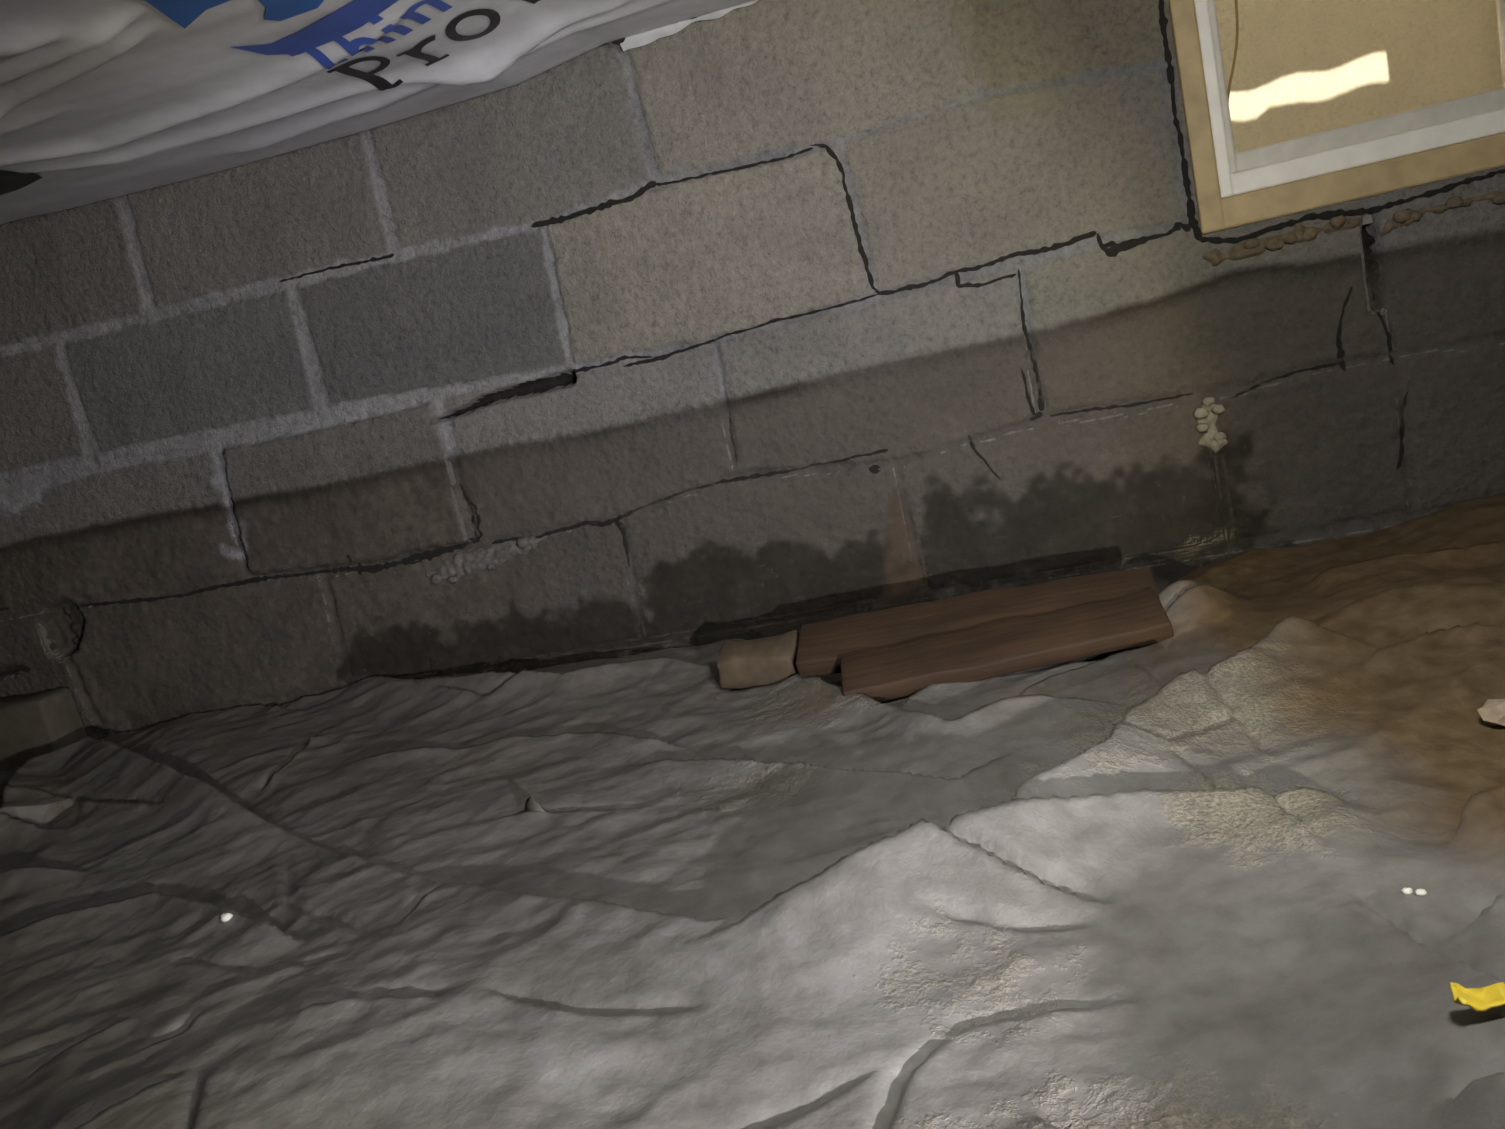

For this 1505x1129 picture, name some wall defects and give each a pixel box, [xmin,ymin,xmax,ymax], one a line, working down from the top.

crack [279,254,394,282]
crack [79,415,888,607]
water stain [0,231,1505,740]
crack [968,435,1000,479]